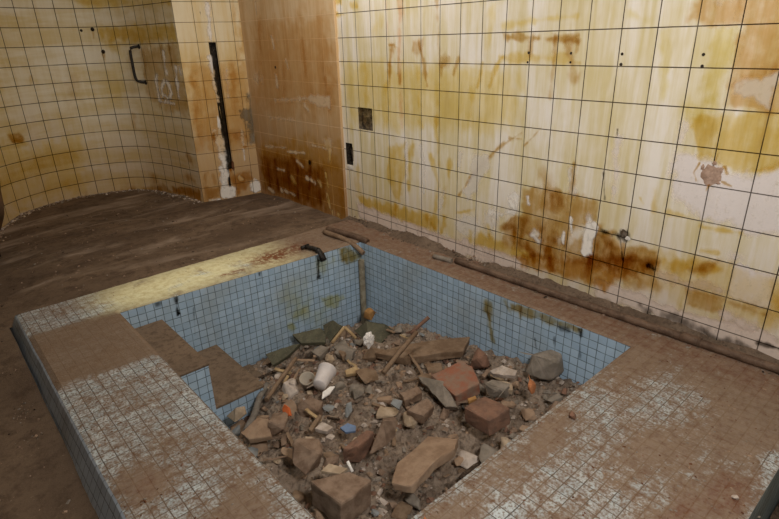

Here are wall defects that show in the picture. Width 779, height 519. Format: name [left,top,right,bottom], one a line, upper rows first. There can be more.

peeling [207,54,219,102]
peeling [209,115,293,201]
spalling [700,161,723,186]